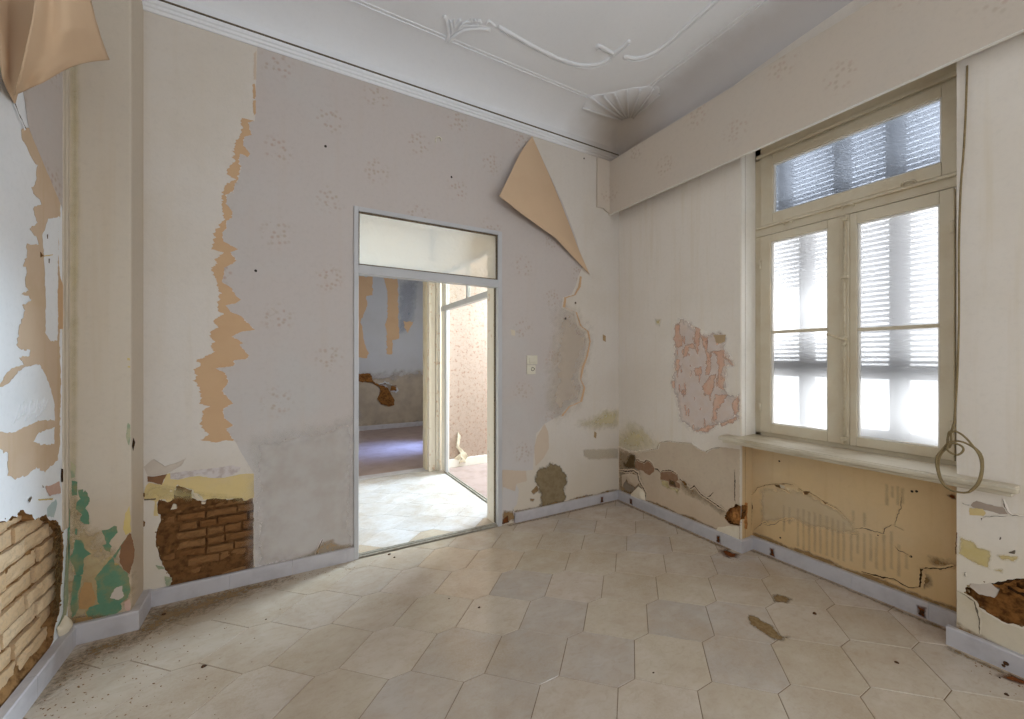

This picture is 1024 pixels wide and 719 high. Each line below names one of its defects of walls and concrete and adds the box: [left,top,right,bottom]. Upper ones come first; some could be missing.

peeling [0,0,110,103]
peeling [499,137,589,273]
peeling [0,364,55,445]
spalling [359,373,399,406]
peeling [618,320,748,539]
spalling [0,462,255,707]
crack [619,467,983,635]
peeling [969,501,1008,520]
spalling [957,538,1024,655]